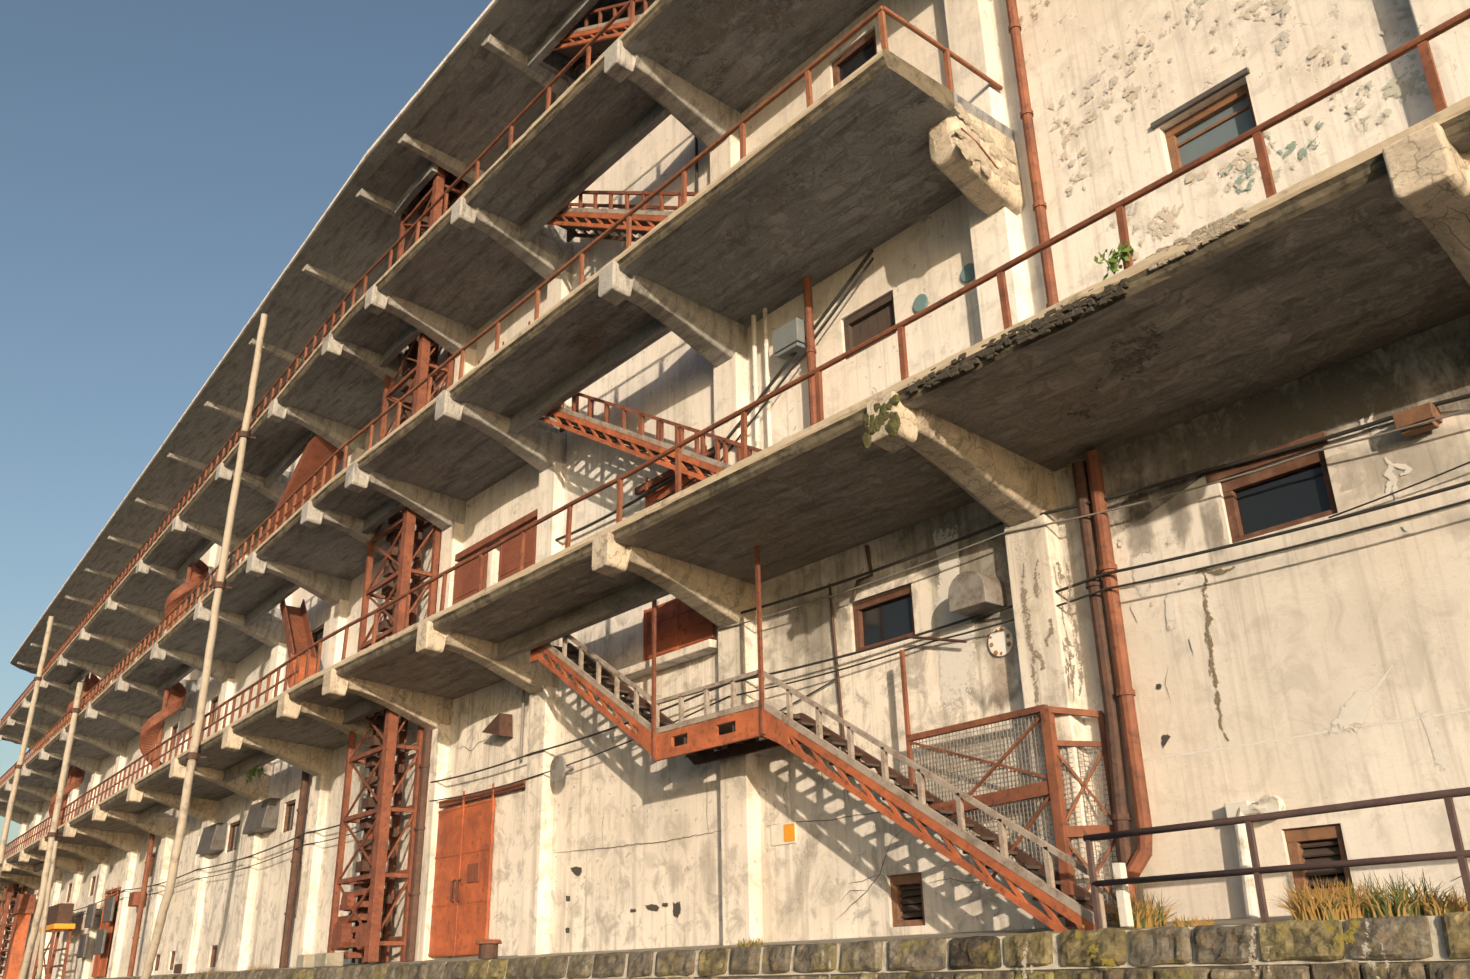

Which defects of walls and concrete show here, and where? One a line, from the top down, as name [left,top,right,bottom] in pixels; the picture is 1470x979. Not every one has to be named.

spalling [864,87,1020,186]
peeling [1048,0,1292,196]
spalling [1107,0,1428,272]
spalling [904,278,1129,394]
spalling [1066,324,1164,427]
damp [1021,941,1033,979]
damp [1248,924,1270,979]
damp [1361,919,1390,979]